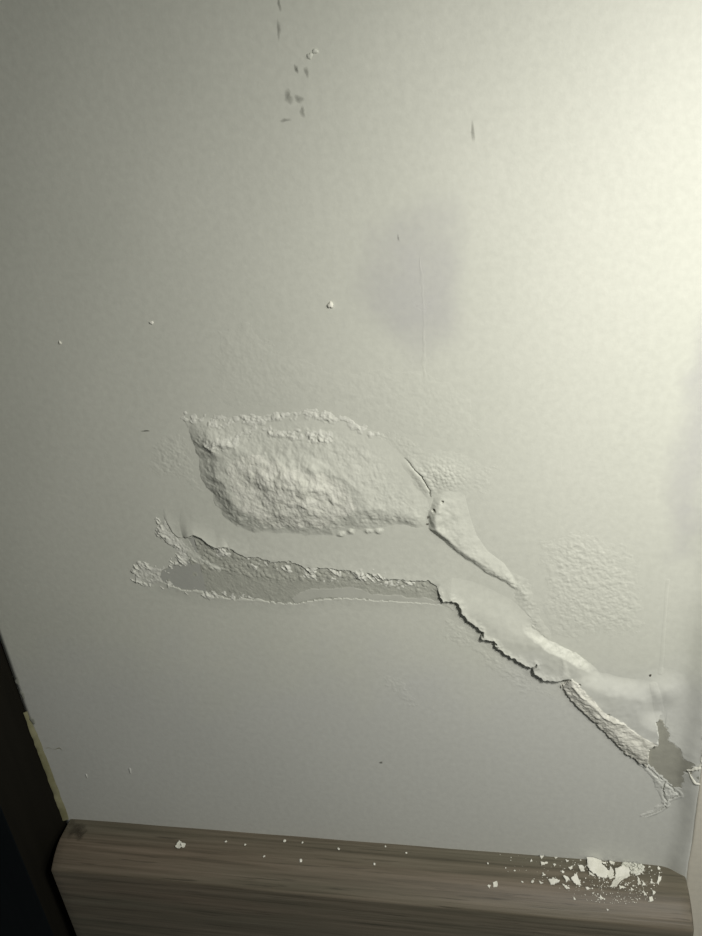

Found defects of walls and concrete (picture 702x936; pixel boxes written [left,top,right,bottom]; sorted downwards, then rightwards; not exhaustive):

peeling [129,495,702,798]